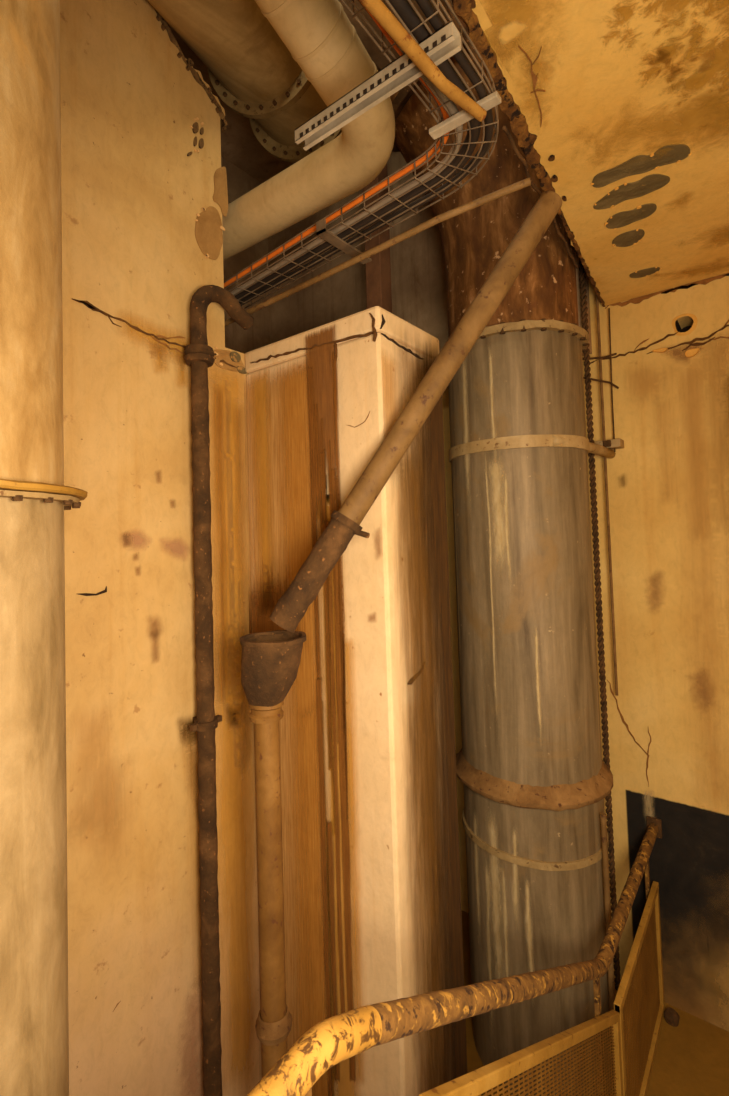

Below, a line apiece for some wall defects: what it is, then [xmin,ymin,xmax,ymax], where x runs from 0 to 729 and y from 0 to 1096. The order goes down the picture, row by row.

damp [488,0,536,54]
peeling [195,167,228,260]
crack [605,273,729,309]
crack [72,298,185,356]
crack [215,313,423,368]
crack [590,320,729,363]
rust [245,326,358,1051]
crack [607,680,651,786]
rust [312,1053,360,1096]